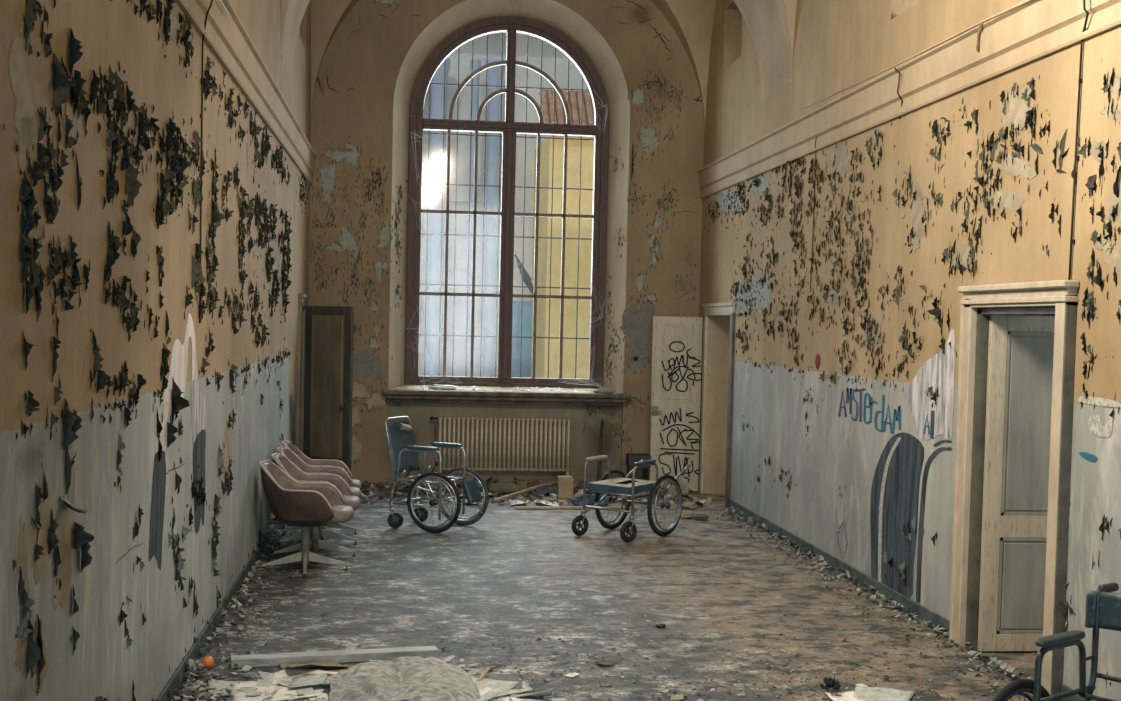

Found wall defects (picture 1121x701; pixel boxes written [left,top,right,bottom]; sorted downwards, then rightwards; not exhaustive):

crack [316,61,355,92]
crack [610,0,701,113]
peeling [627,68,687,160]
peeling [604,146,678,384]
peeling [704,70,1121,442]
peeling [4,0,407,701]
peeling [755,457,797,498]
peeling [443,655,521,680]